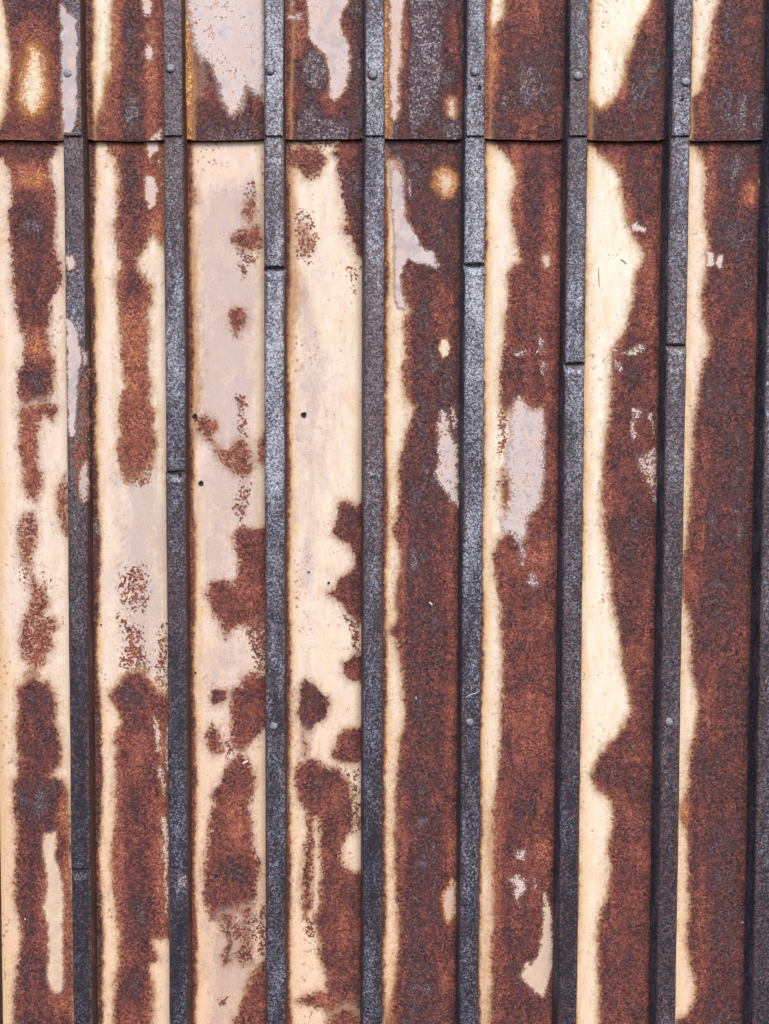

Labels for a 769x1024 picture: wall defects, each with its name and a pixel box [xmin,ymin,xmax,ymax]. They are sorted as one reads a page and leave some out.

rust [0,0,169,1024]
rust [185,0,266,1024]
rust [285,0,364,1024]
rust [382,0,464,1024]
rust [478,0,565,1024]
rust [580,0,667,1024]
rust [675,0,766,1024]